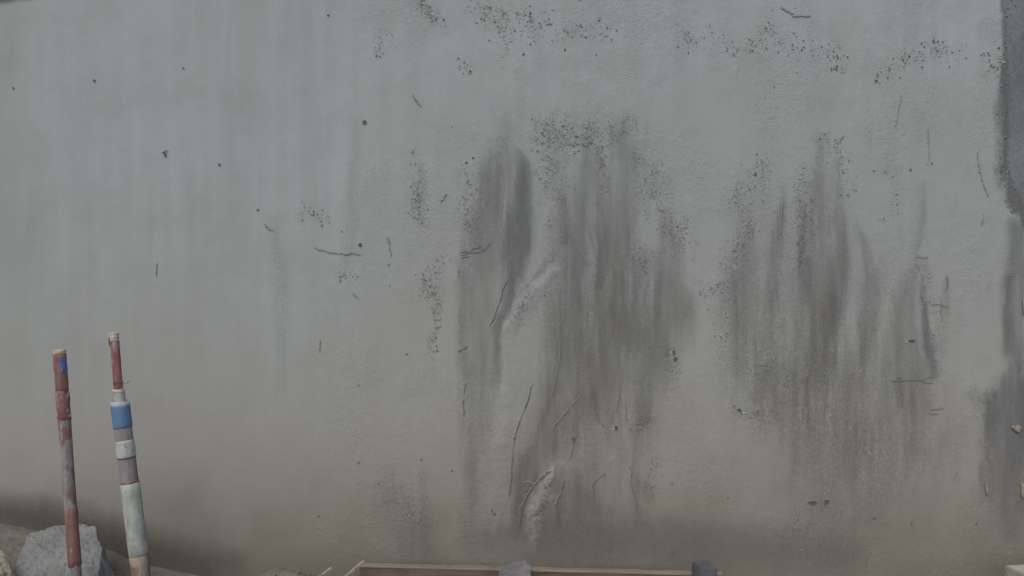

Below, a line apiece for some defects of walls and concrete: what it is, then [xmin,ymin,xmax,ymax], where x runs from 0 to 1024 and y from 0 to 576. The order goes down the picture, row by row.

leakage [508,164,530,292]
crack [509,293,574,526]